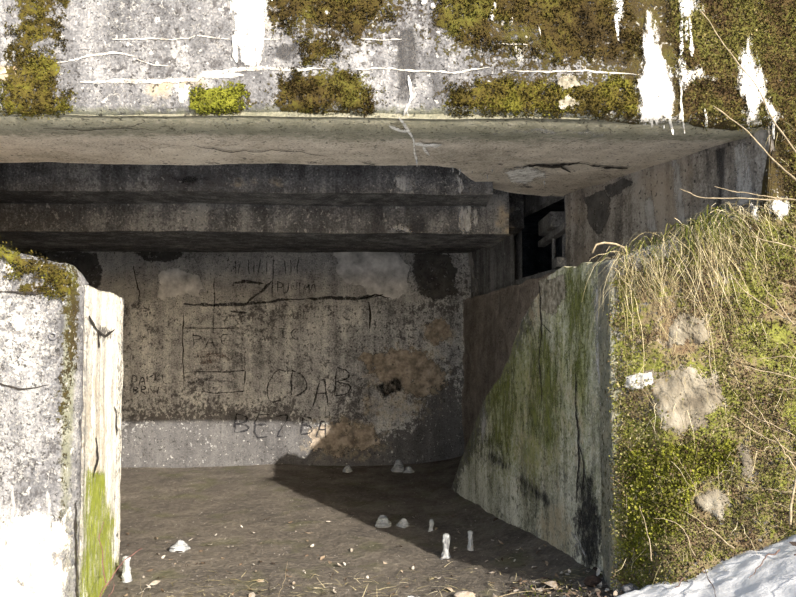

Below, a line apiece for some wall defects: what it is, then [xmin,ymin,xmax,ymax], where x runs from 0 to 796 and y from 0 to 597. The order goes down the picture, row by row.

leakage [230,0,272,68]
leakage [638,0,703,134]
leakage [740,39,776,139]
crack [0,289,46,297]
crack [0,382,45,390]
crack [575,373,584,503]
leakage [0,485,72,597]
leakage [518,476,550,508]
leakage [575,471,602,567]